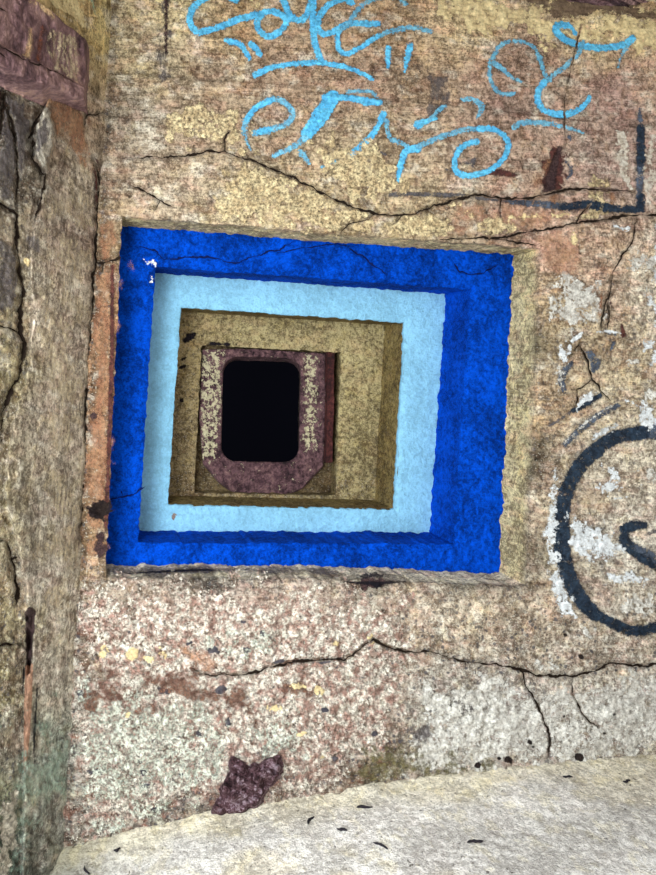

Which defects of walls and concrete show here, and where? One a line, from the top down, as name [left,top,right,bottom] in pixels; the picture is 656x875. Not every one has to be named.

crack [0,93,46,442]
crack [88,162,121,356]
crack [129,132,656,331]
corrosion [507,145,571,220]
peeling [571,174,615,246]
peeling [642,132,656,204]
corrosion [85,222,119,560]
peeling [555,332,583,390]
peeling [563,391,612,444]
peeling [622,339,656,432]
crack [2,540,20,604]
crack [192,638,656,756]